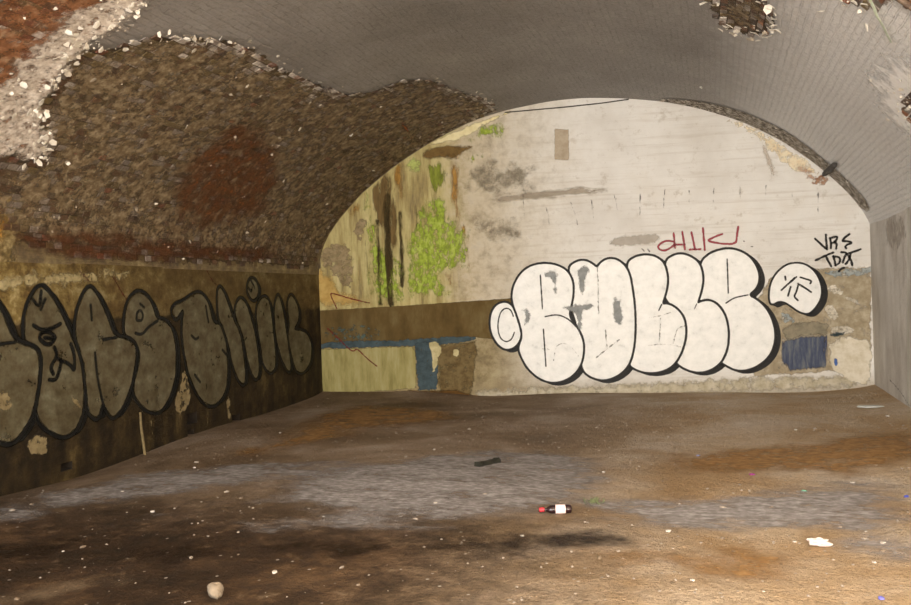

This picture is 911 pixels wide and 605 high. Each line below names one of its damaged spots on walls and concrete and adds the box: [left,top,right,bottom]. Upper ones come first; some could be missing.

spalling [699,0,781,41]
spalling [839,0,892,43]
spalling [887,91,911,123]
spalling [0,0,498,291]
spalling [660,99,869,212]
damp [372,176,404,307]
peeling [825,305,854,334]
peeling [429,342,442,372]